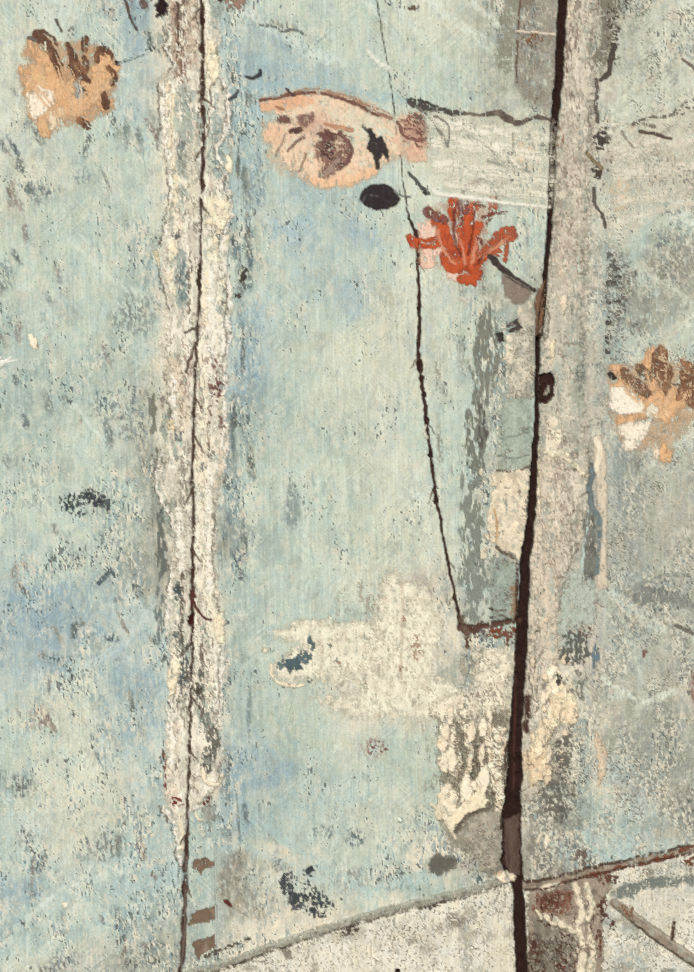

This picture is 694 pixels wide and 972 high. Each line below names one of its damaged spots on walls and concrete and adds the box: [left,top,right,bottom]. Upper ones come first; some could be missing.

peeling [151,0,235,868]
crack [176,0,694,972]
peeling [262,0,630,873]
rust [526,873,618,972]